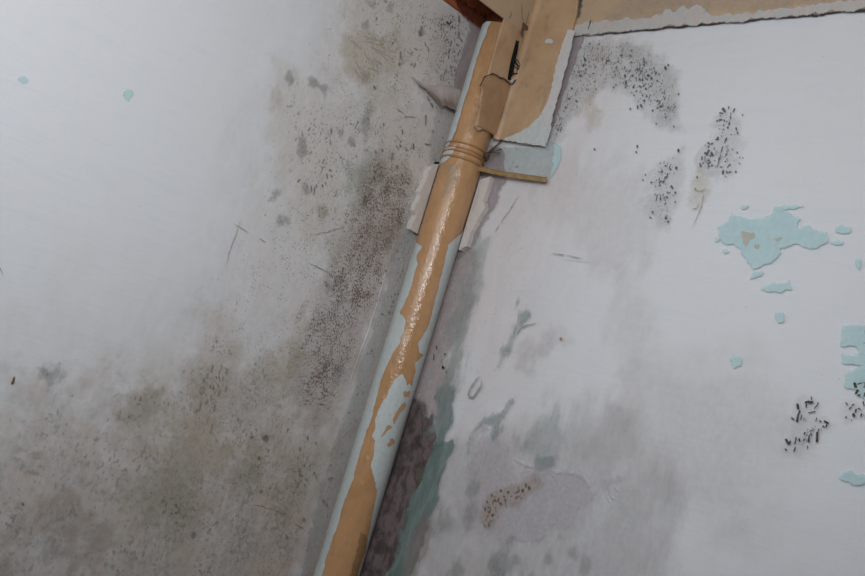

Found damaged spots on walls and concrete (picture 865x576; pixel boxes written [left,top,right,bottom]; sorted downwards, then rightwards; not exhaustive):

water stain [355,0,468,89]
water stain [549,38,679,139]
peeling [457,36,584,259]
water stain [695,106,743,190]
water stain [642,161,678,225]
peeling [715,204,851,279]
water stain [280,94,436,505]
peeling [840,324,865,400]
water stain [360,252,474,576]
water stain [785,396,829,452]